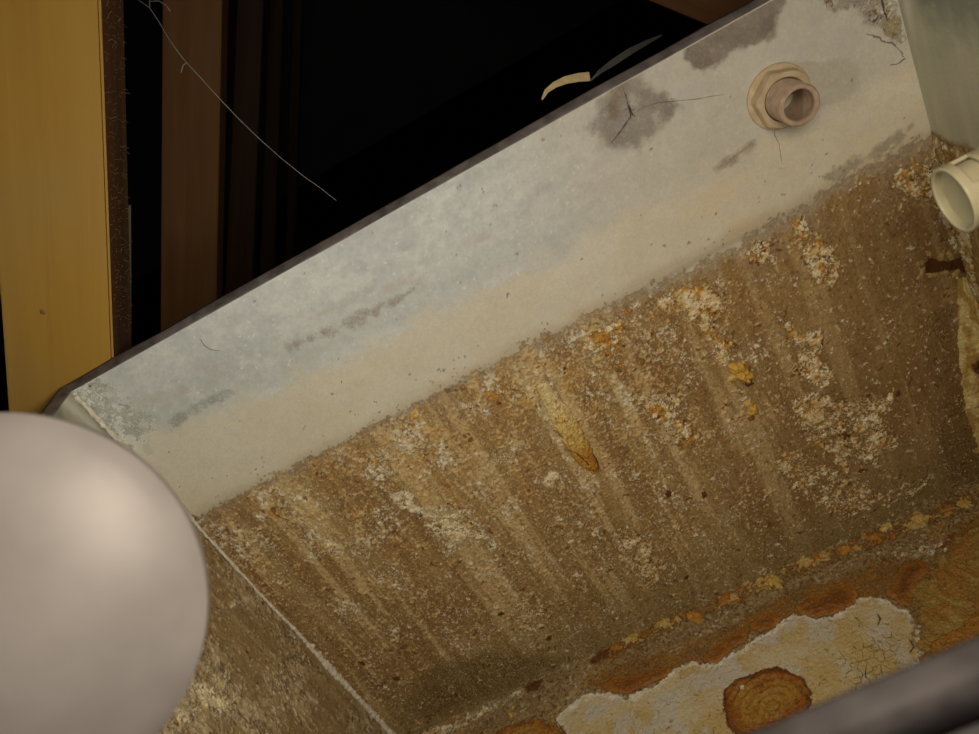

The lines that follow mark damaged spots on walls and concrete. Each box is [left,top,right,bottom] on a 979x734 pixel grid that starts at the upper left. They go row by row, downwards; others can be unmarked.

crack [611,89,724,143]